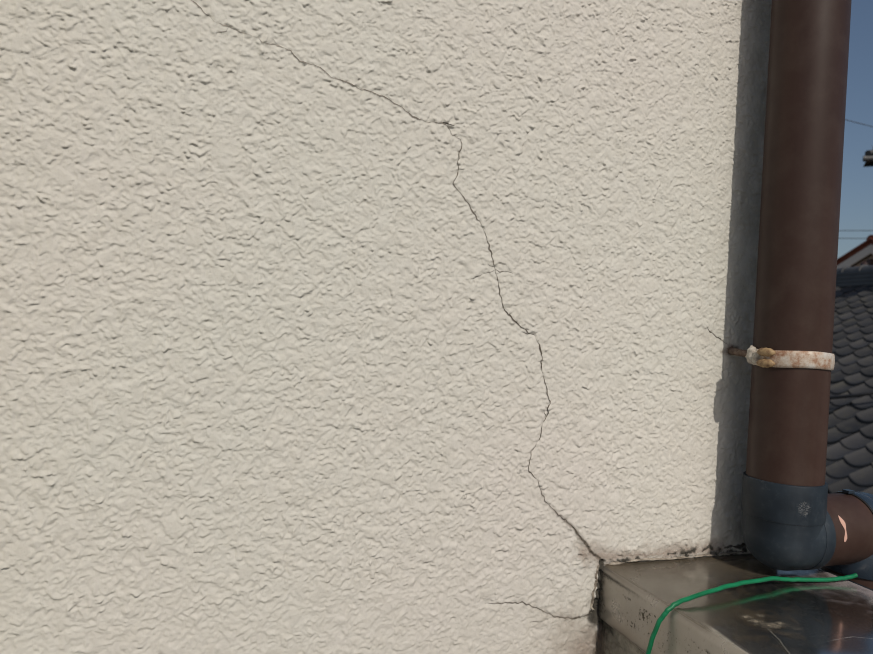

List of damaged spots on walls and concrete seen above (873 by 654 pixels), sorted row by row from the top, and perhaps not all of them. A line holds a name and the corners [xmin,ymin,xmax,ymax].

crack [191,0,601,560]
crack [485,601,592,622]